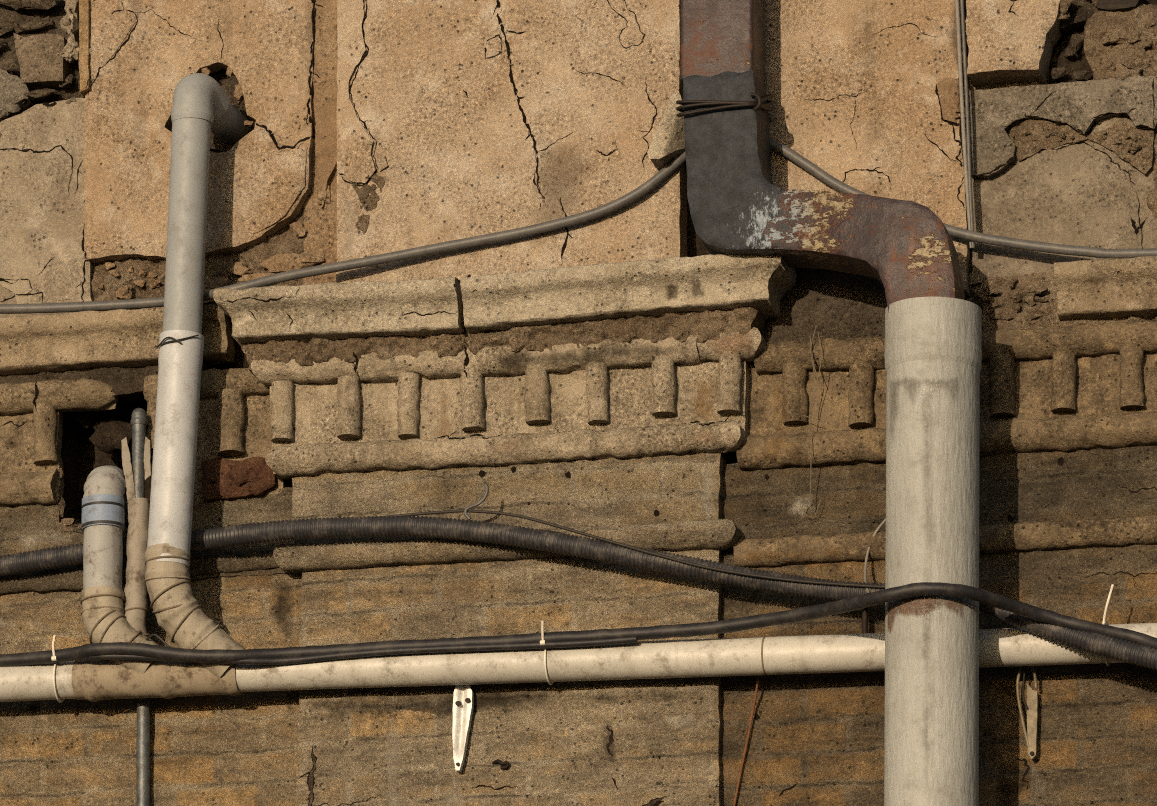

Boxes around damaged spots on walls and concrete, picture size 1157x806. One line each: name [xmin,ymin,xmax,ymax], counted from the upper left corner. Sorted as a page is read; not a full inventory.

crack [0,1,224,196]
crack [256,0,325,152]
crack [341,0,377,186]
crack [475,0,573,259]
crack [578,71,657,167]
spalling [1009,118,1157,219]
spalling [1047,0,1157,84]
spalling [91,257,166,311]
spalling [203,185,331,305]
crack [405,274,470,379]
spalling [56,497,84,534]
crack [299,747,384,806]